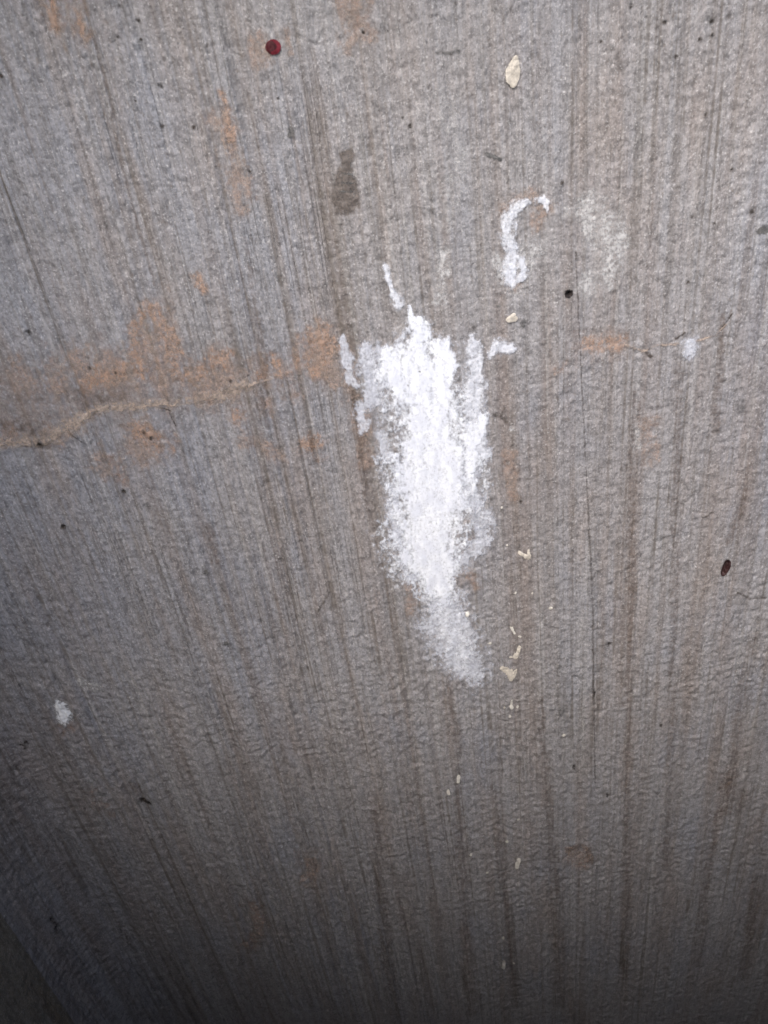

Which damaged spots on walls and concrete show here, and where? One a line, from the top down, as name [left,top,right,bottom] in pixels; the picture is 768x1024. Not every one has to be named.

water stain [492,196,550,296]
crack [0,374,272,447]
water stain [339,264,517,686]